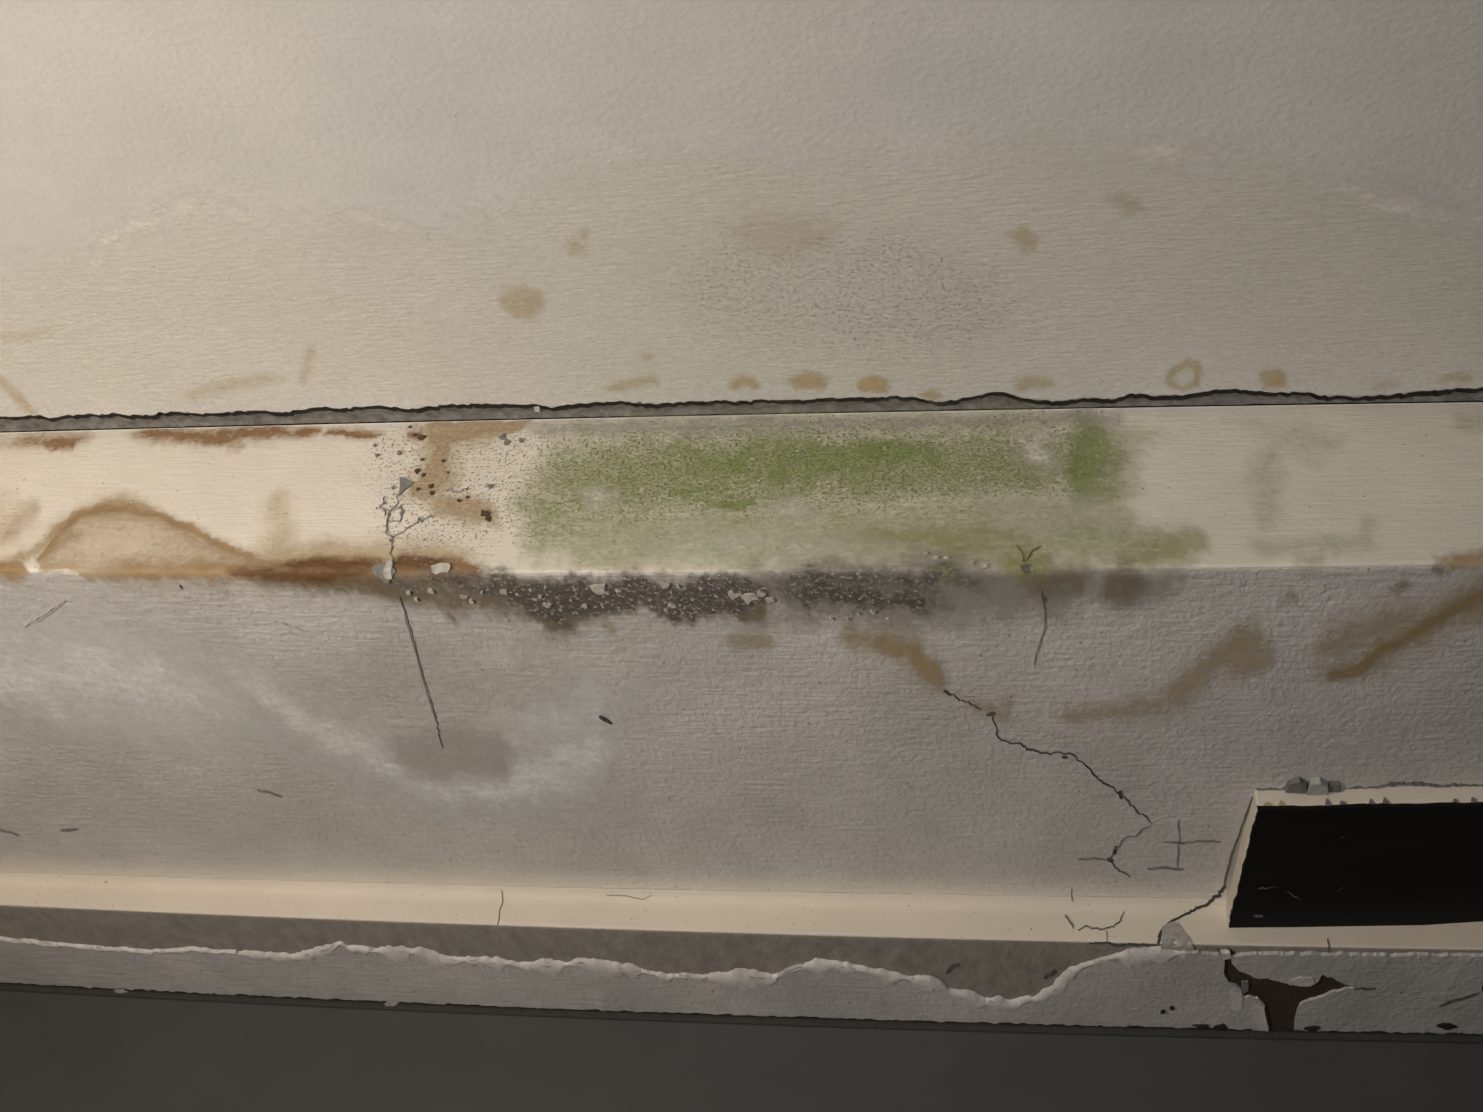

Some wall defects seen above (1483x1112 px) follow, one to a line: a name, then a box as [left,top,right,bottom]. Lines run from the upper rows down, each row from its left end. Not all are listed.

crack [0,387,1483,431]
leakage [0,498,284,580]
leakage [356,552,1168,689]
leakage [0,620,616,816]
crack [943,690,1285,951]
crack [1344,781,1483,789]
peeling [0,936,1483,1034]